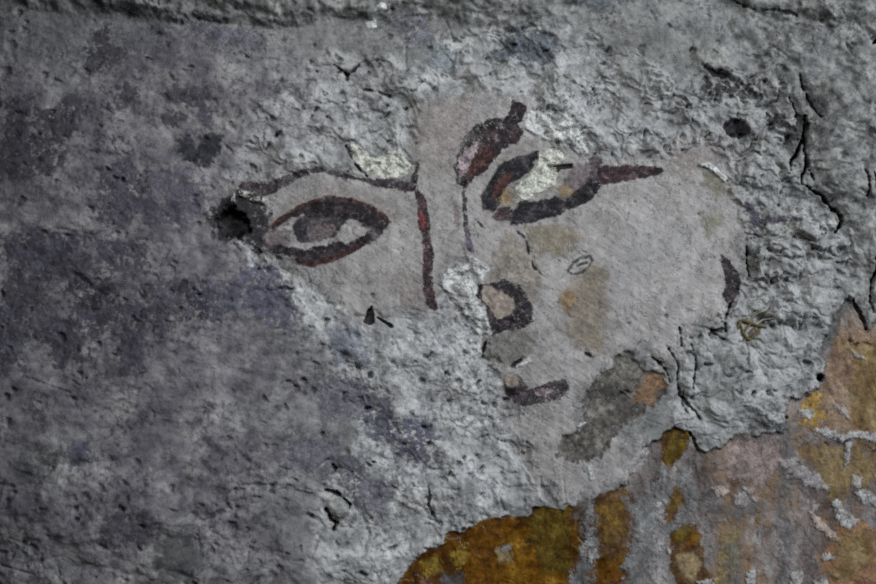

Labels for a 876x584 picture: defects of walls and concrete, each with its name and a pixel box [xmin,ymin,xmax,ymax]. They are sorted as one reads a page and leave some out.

crack [788,74,843,233]
crack [865,170,876,197]
crack [710,303,731,340]
crack [743,246,751,277]
crack [849,258,876,346]
crack [651,328,701,452]
spalling [555,299,876,584]